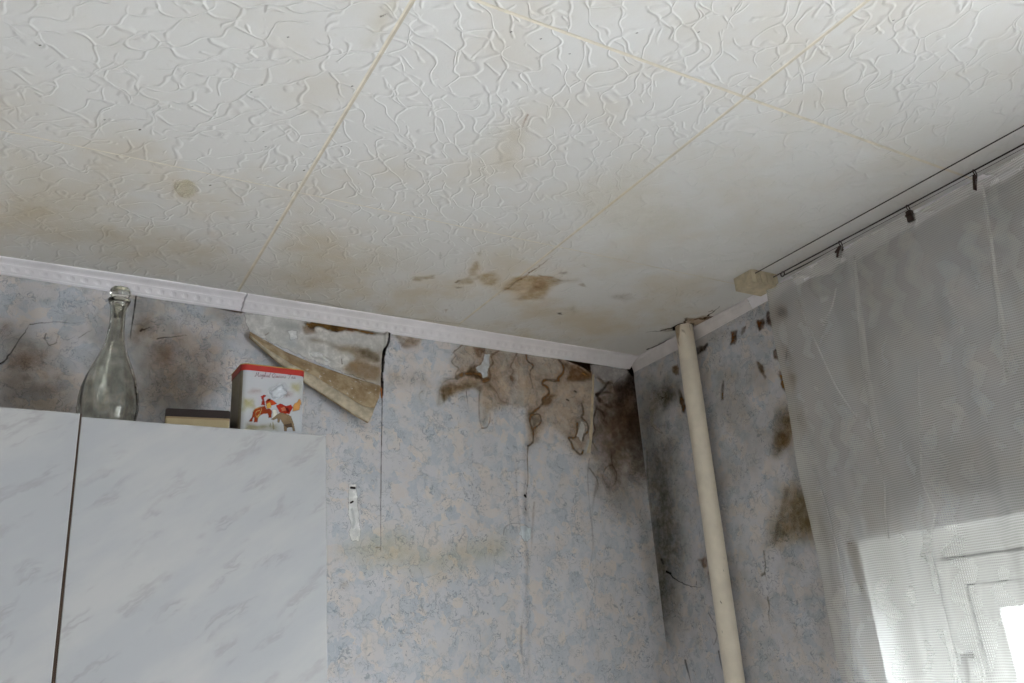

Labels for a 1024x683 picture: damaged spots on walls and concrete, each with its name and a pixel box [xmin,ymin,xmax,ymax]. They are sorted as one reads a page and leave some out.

damp [455,262,566,300]
flaking render [244,313,389,386]
damp [775,407,802,455]
damp [441,345,682,622]
damp [774,489,819,541]